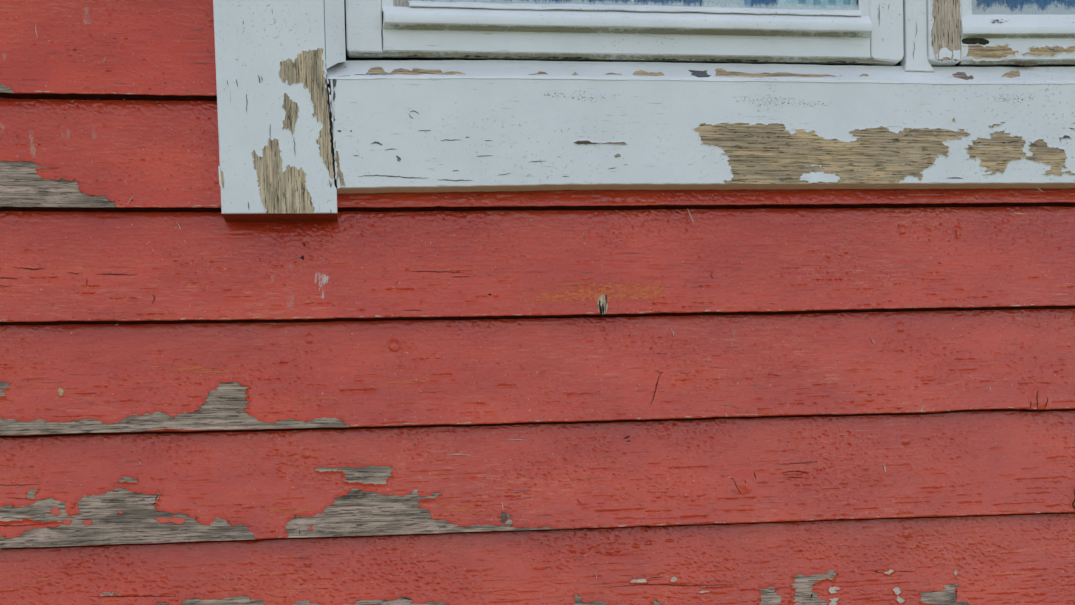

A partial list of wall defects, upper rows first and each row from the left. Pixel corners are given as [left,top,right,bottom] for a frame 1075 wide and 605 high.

peeling [930,0,1075,81]
peeling [250,46,346,213]
peeling [692,115,1075,184]
peeling [0,157,118,207]
peeling [0,378,351,435]
peeling [0,474,257,548]
peeling [281,462,575,538]
peeling [147,592,466,605]
peeling [564,575,716,605]
peeling [755,566,843,605]
peeling [883,567,984,605]